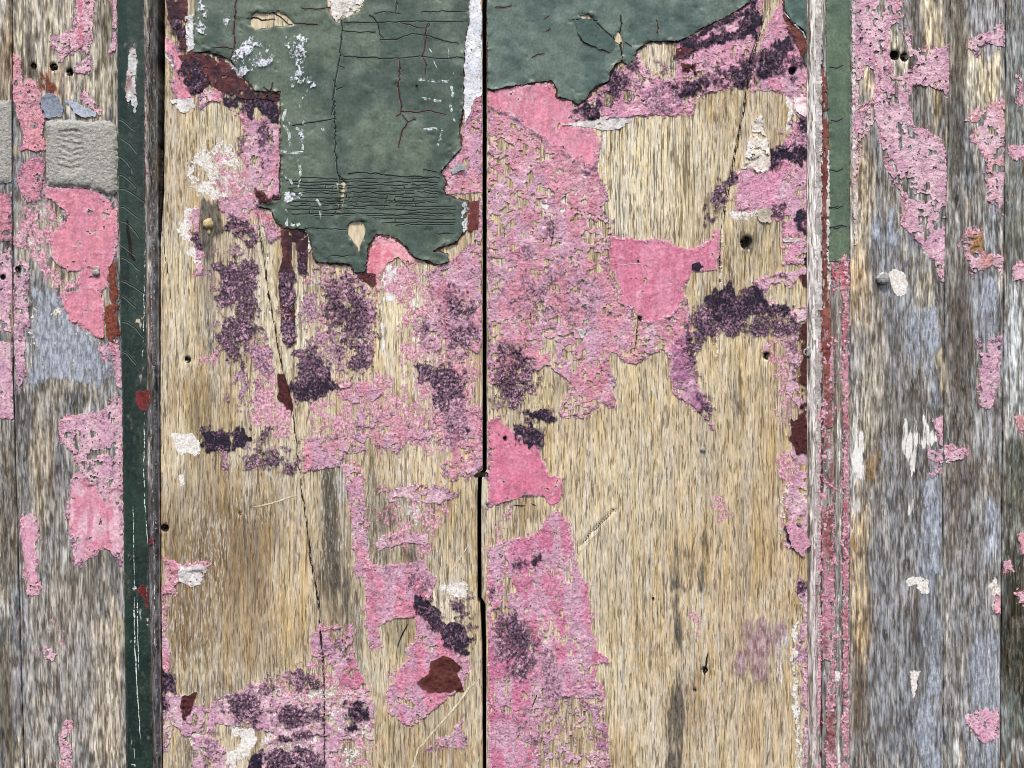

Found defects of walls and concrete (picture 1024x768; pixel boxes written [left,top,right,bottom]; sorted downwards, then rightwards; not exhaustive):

crack [212,0,239,60]
crack [263,0,466,258]
peeling [962,22,1005,58]
peeling [964,73,1024,216]
peeling [0,0,155,768]
crack [258,220,285,375]
peeling [161,0,950,768]
peeling [957,225,1024,411]
crack [291,409,325,767]